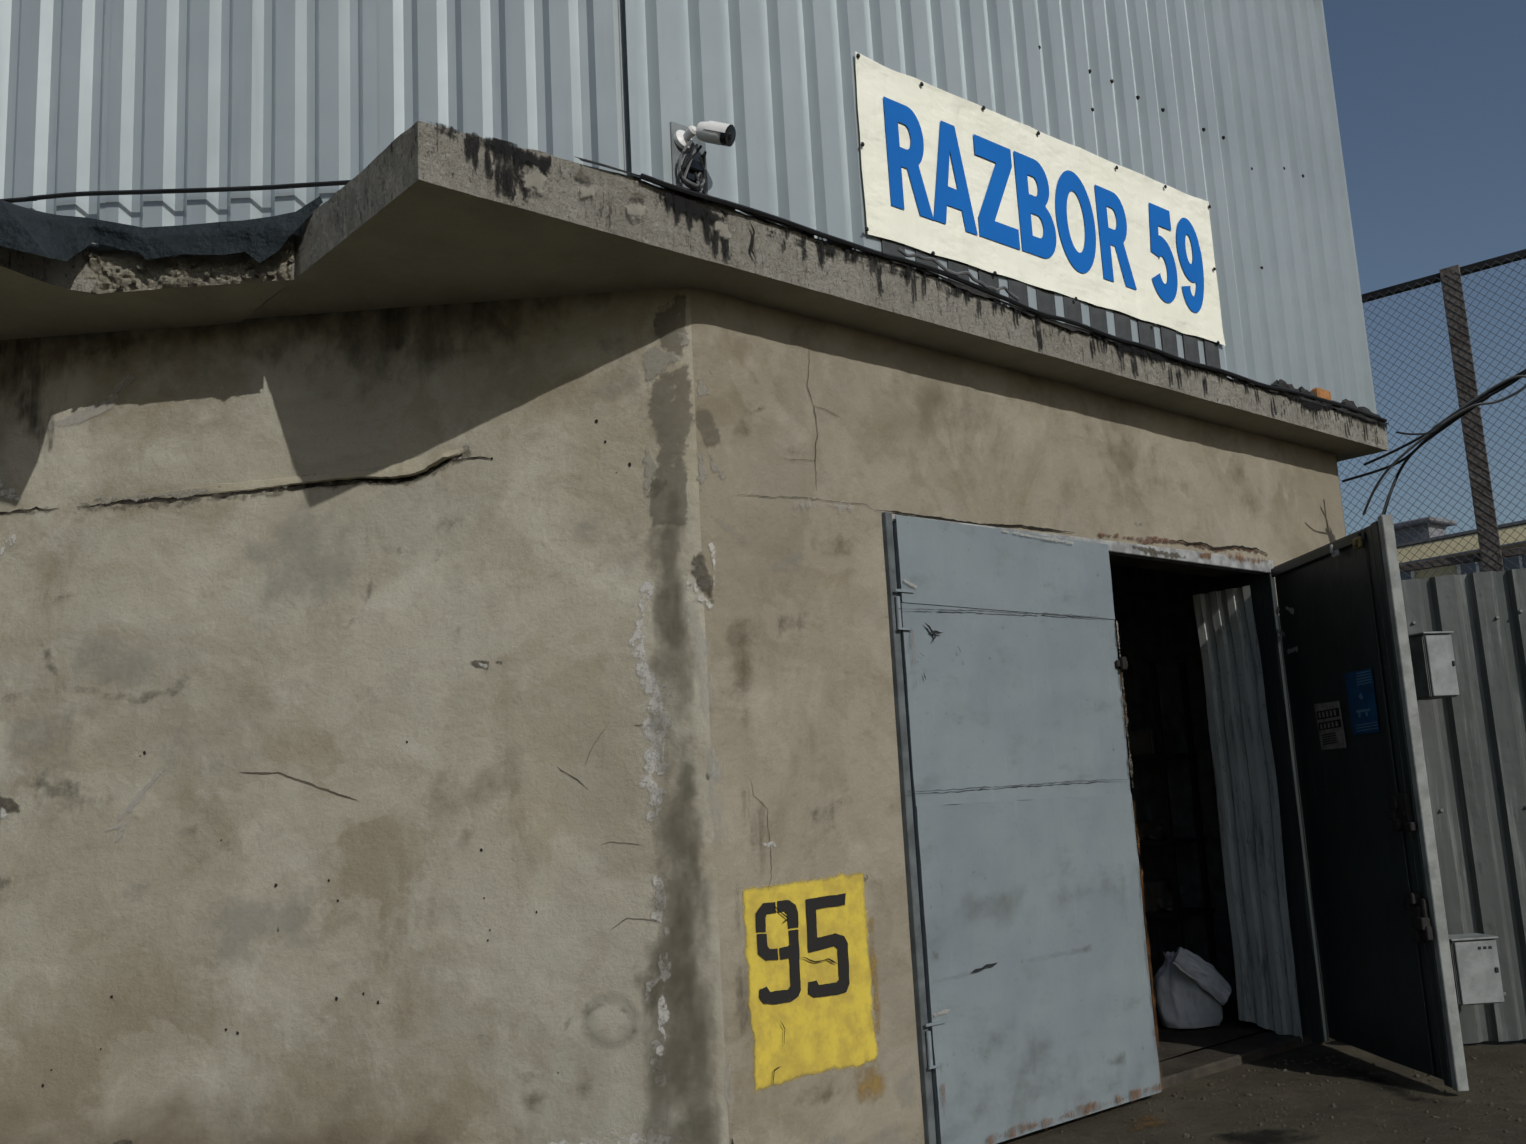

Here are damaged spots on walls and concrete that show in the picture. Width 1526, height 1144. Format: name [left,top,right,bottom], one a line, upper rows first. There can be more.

spalling [87,243,294,294]
crack [0,443,491,514]
damp [686,542,715,608]
damp [629,582,671,822]
damp [644,876,671,1087]